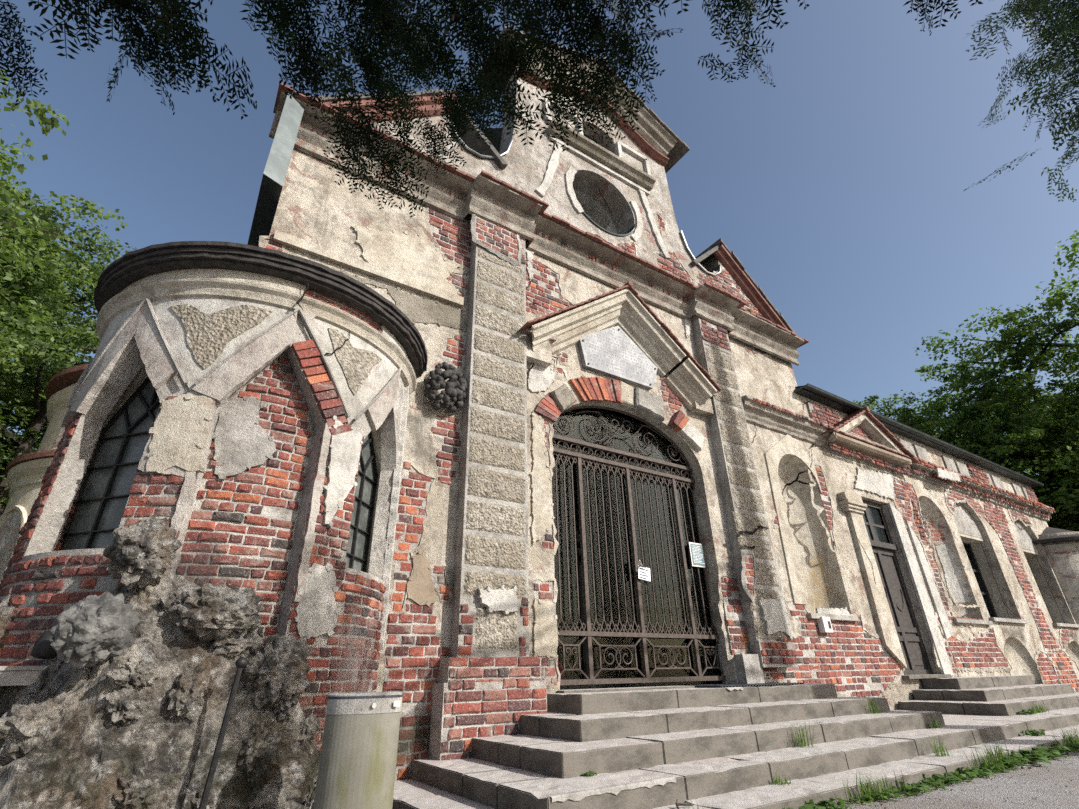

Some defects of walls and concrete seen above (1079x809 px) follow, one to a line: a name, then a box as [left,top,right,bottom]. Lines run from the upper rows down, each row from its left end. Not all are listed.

spalling [259,236,288,254]
peeling [326,206,574,370]
peeling [146,391,276,480]
crack [782,443,814,496]
peeling [293,563,340,640]
spalling [382,409,462,779]
peeling [477,574,561,690]
crack [738,525,769,549]
spalling [718,550,905,697]
spalling [854,467,1079,693]